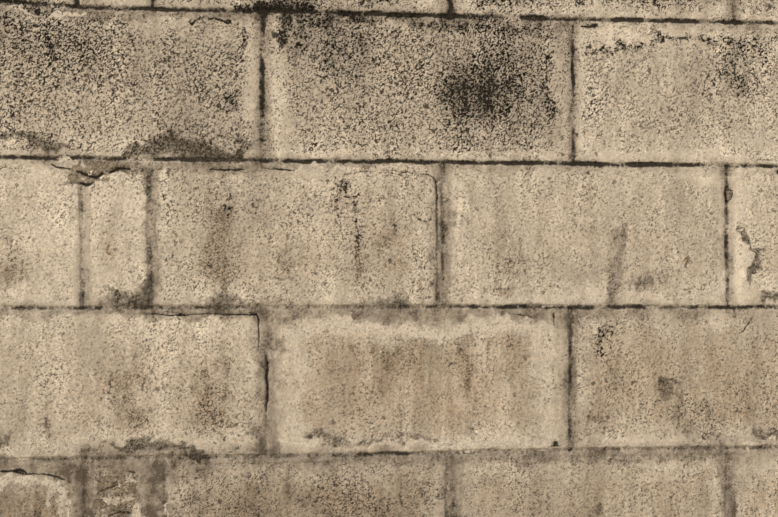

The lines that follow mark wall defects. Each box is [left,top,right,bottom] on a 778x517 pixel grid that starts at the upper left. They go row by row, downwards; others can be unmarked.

mould [189,0,559,133]
spalling [64,160,138,188]
crack [0,468,65,480]